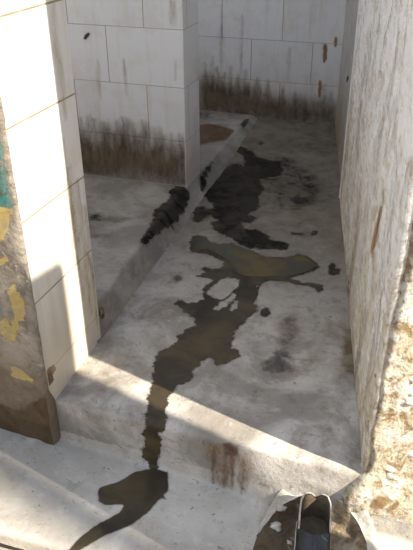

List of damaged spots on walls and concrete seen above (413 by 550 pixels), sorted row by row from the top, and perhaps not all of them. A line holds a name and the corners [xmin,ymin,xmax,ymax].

damp [199,81,335,125]
peeling [0,145,14,241]
corrosion [370,206,381,253]
peeling [0,284,26,342]
damp [70,132,323,550]
peeling [9,364,35,384]
flaking render [47,365,56,386]
corrosion [207,443,251,484]